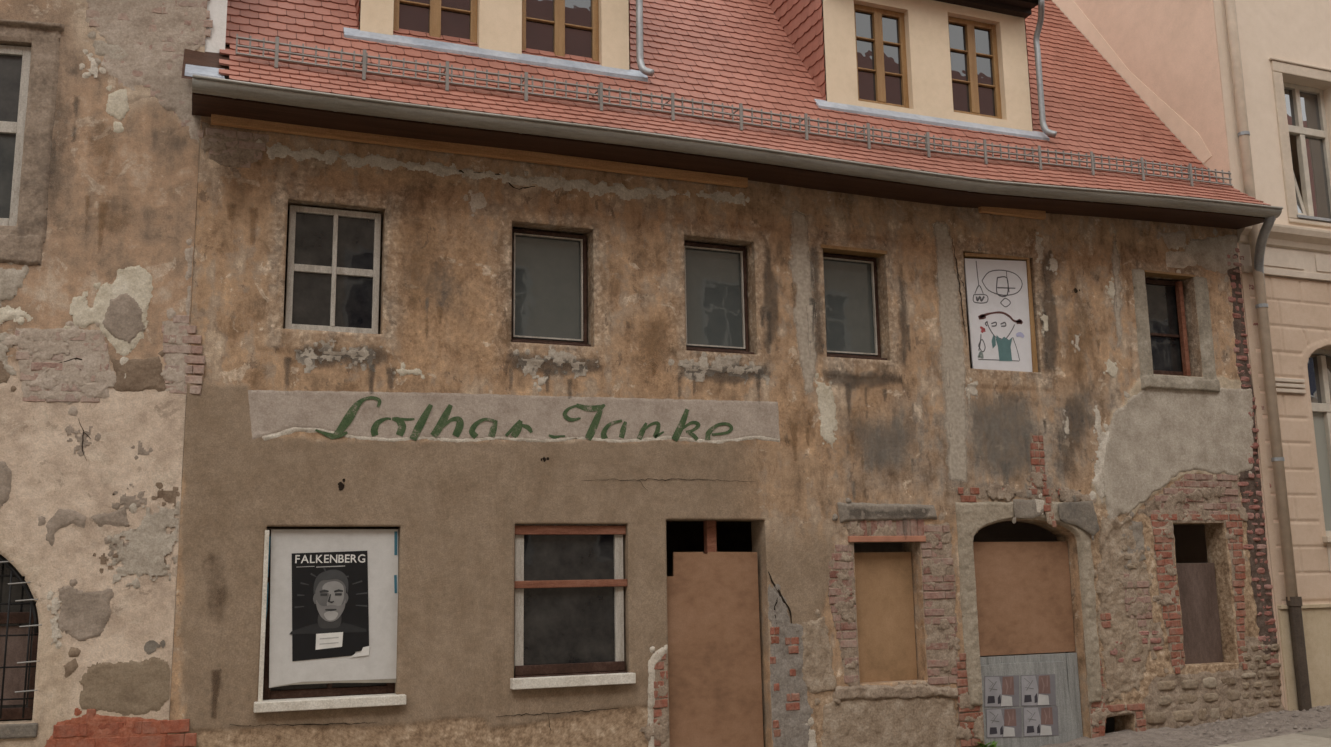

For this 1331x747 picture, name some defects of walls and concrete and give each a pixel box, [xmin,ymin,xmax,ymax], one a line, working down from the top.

flaking render [0,239,205,457]
flaking render [93,482,180,589]
flaking render [958,227,1285,738]
flaking render [46,591,81,678]
flaking render [144,640,165,655]
flaking render [640,645,669,747]
flaking render [768,584,817,747]
flaking render [828,512,984,747]